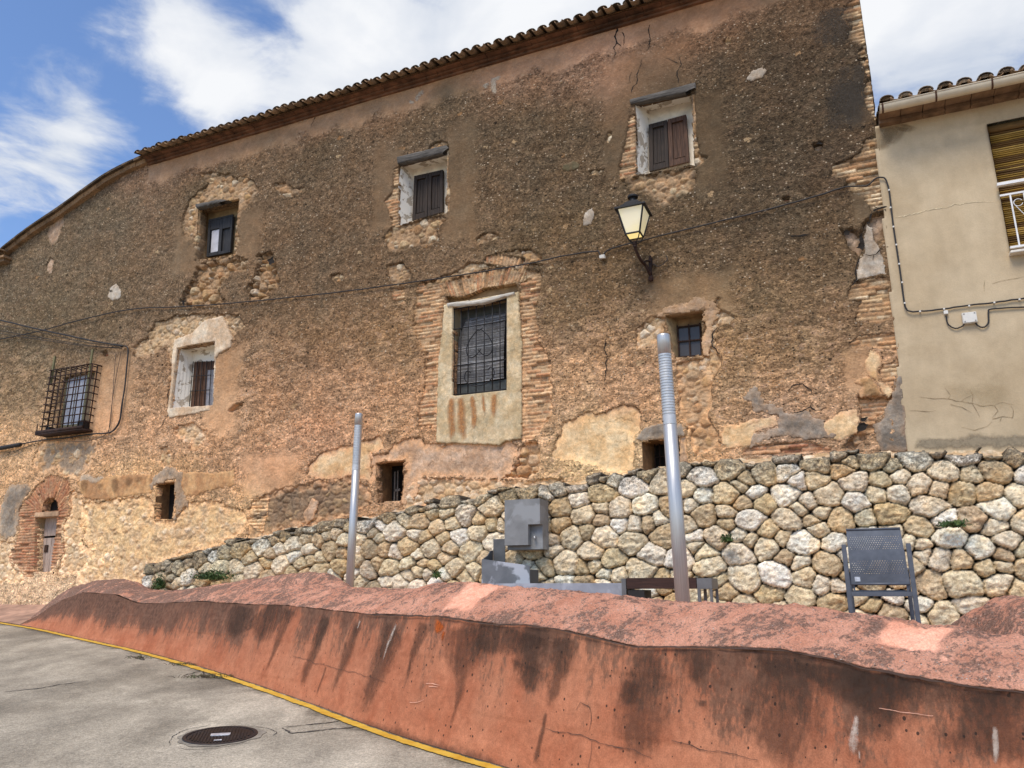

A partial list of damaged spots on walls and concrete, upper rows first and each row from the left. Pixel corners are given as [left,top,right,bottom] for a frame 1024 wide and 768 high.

crack [613,25,682,92]
flaking render [619,115,638,182]
spalling [182,172,259,265]
flaking render [384,169,401,228]
flaking render [831,137,884,256]
spalling [247,253,280,301]
rust [448,395,496,436]
flaking render [308,253,642,505]
flaking render [721,278,898,456]
crack [913,388,1014,430]
flaking render [9,474,152,579]
flaking render [248,495,270,532]